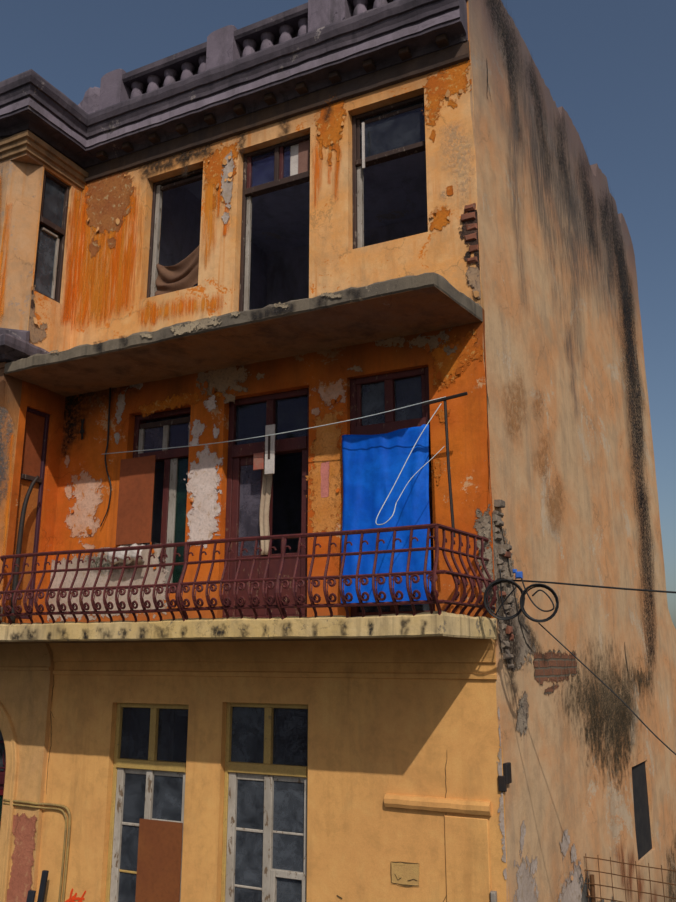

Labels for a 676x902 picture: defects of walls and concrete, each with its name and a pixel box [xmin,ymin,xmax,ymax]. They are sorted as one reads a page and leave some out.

peeling [421,60,472,142]
rust [61,184,142,324]
peeling [83,171,135,258]
peeling [203,138,240,224]
rust [314,142,341,204]
damp [487,0,656,661]
peeling [47,455,169,622]
peeling [184,419,224,548]
damp [497,586,539,697]
spalling [473,500,578,695]
damp [562,647,652,780]
peeling [558,829,590,902]